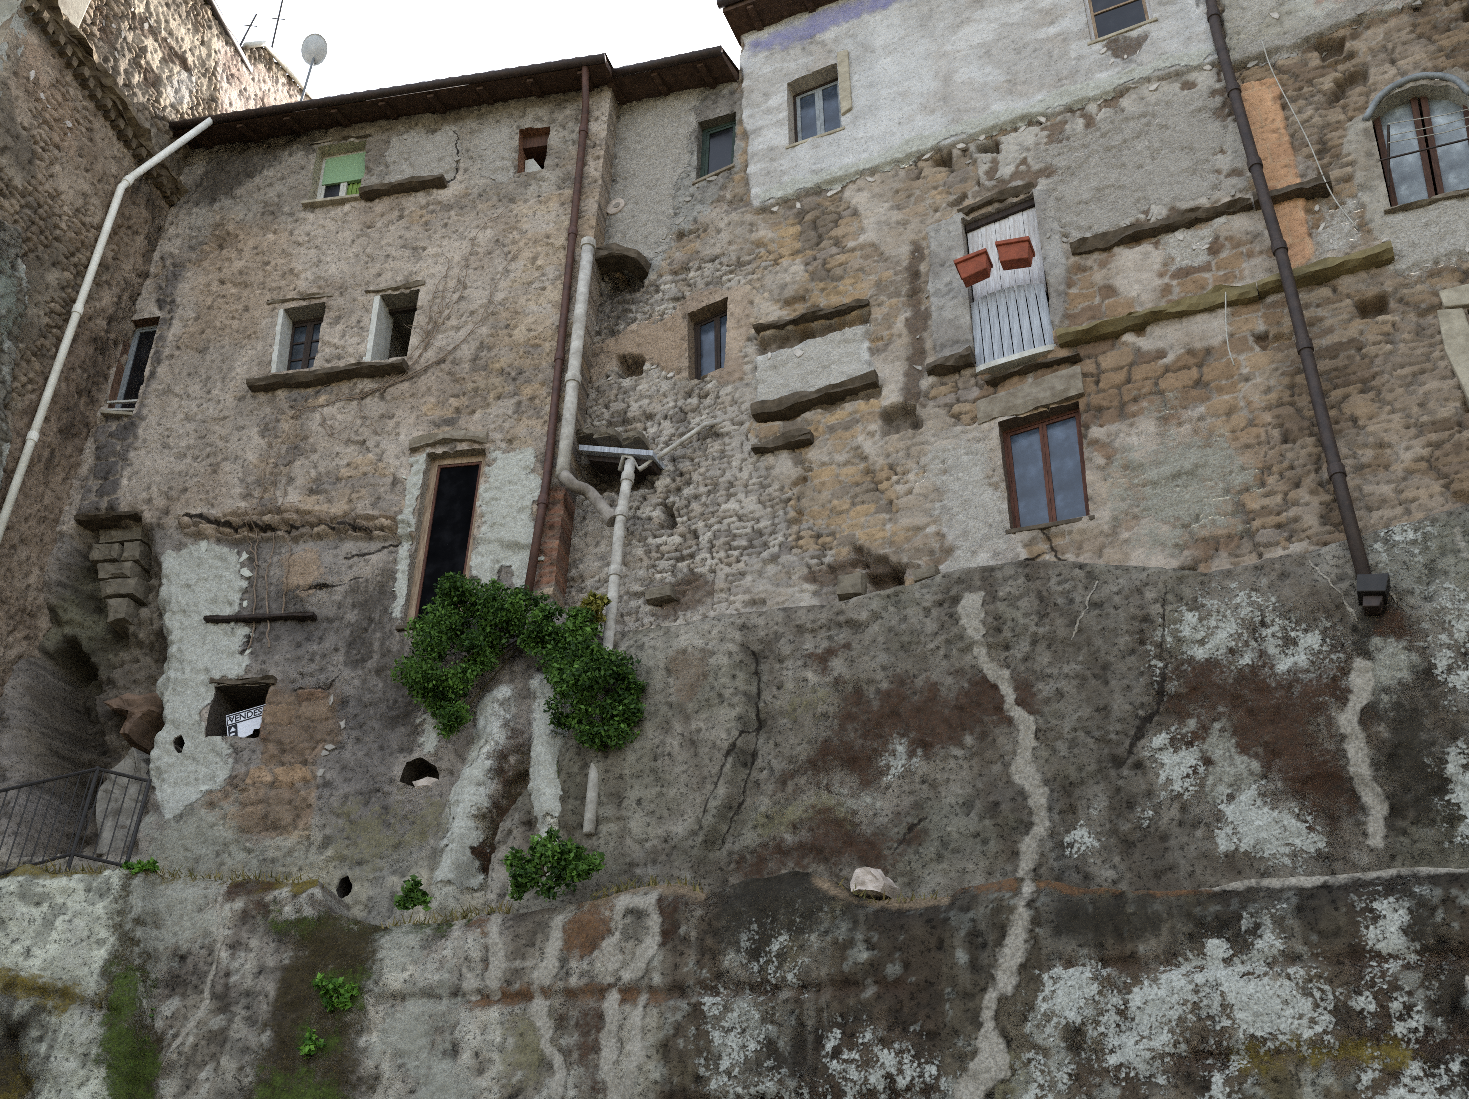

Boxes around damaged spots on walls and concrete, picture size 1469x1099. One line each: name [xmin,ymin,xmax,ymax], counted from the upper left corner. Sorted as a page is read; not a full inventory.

flaking render [1229,0,1424,70]
flaking render [606,88,717,259]
flaking render [758,34,1236,270]
flaking render [1314,193,1361,254]
flaking render [1381,200,1469,275]
flaking render [600,313,687,379]
flaking render [752,326,871,401]
flaking render [902,242,931,408]
flaking render [149,539,254,819]
flaking render [317,744,337,777]
crack [696,650,761,850]
crack [891,816,928,855]